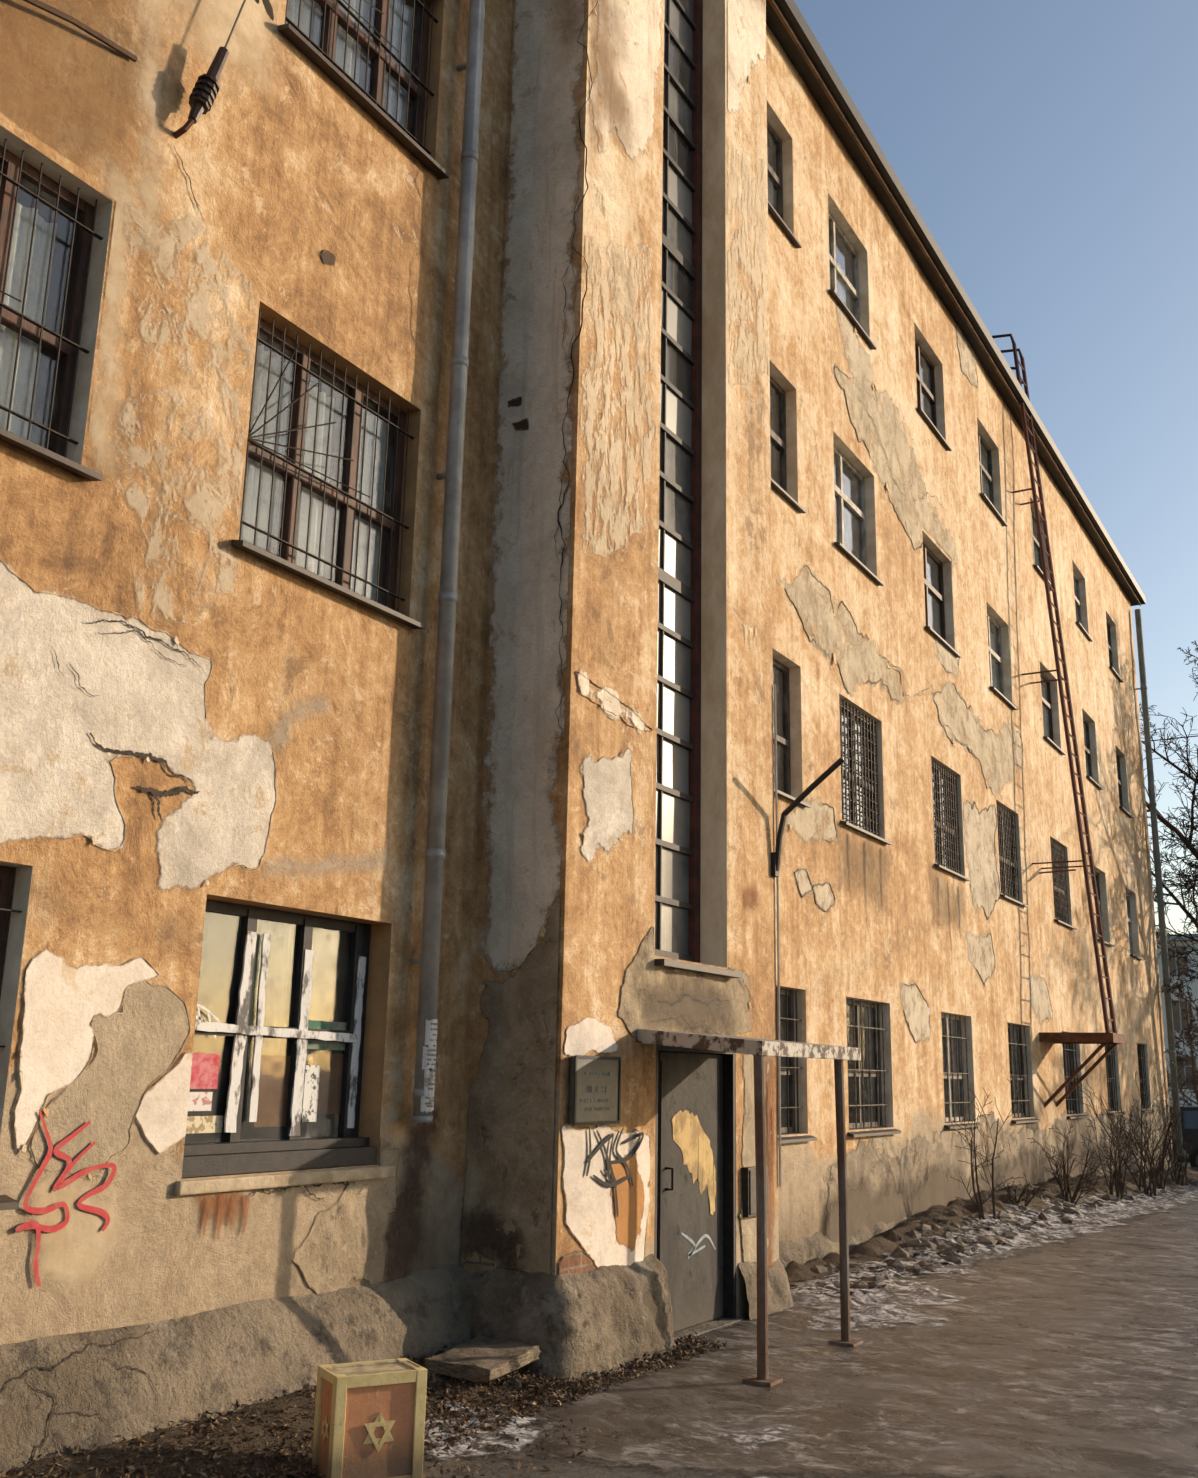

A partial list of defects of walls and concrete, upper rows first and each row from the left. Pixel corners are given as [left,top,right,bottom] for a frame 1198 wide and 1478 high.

peeling [728,0,766,114]
crack [554,1,598,741]
peeling [0,205,277,890]
peeling [479,0,662,973]
peeling [932,638,1024,987]
flaking render [11,950,193,1181]
damp [385,1109,438,1283]
damp [461,1212,523,1271]
peeling [559,1124,652,1275]
spalling [565,926,752,1056]
flaking render [741,1054,772,1167]
crack [0,1330,160,1463]